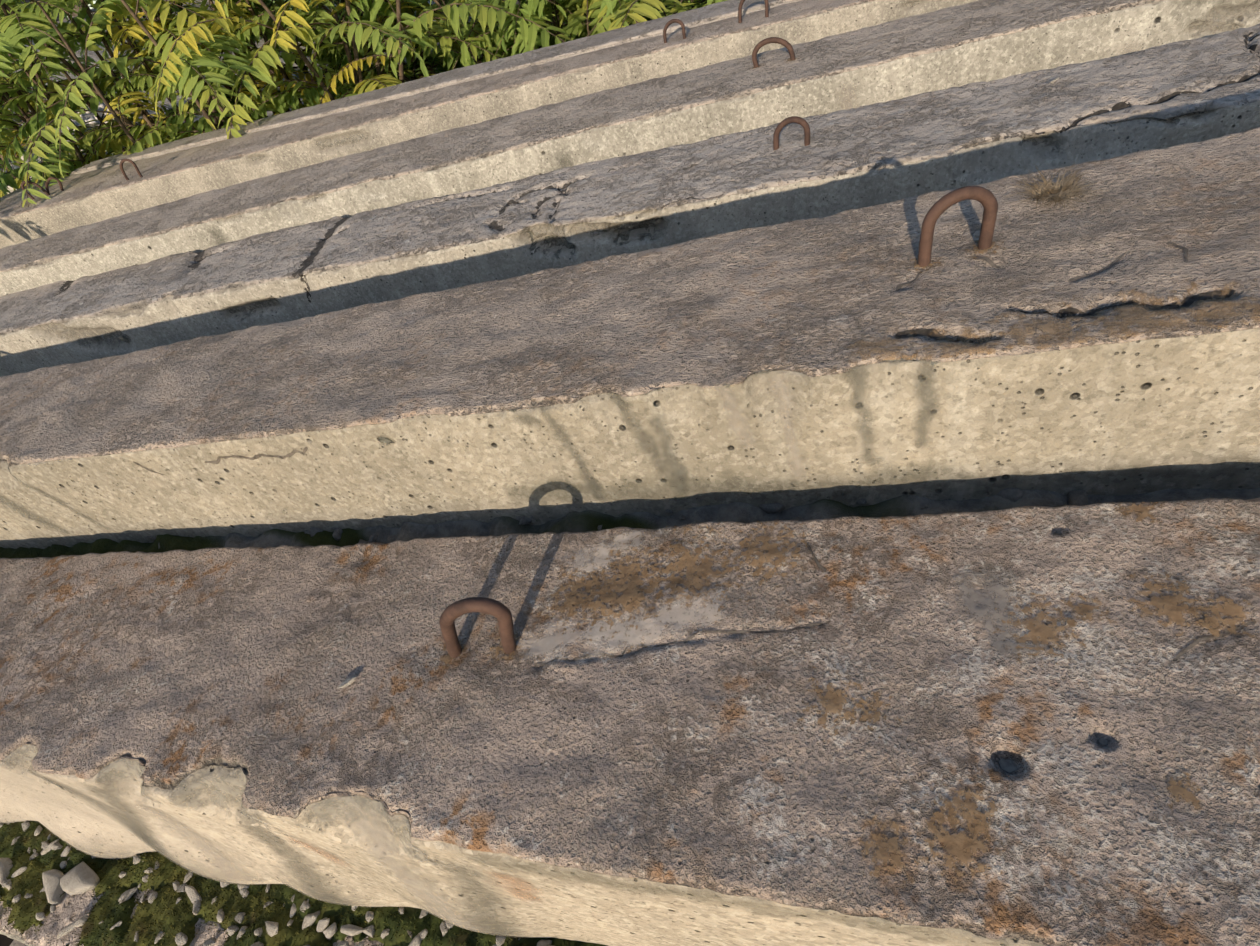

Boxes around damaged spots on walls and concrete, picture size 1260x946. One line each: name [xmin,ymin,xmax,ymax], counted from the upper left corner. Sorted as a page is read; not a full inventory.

crack [1058,32,1260,133]
spalling [517,209,665,258]
spalling [95,758,148,798]
spalling [168,770,265,823]
spalling [297,796,439,865]